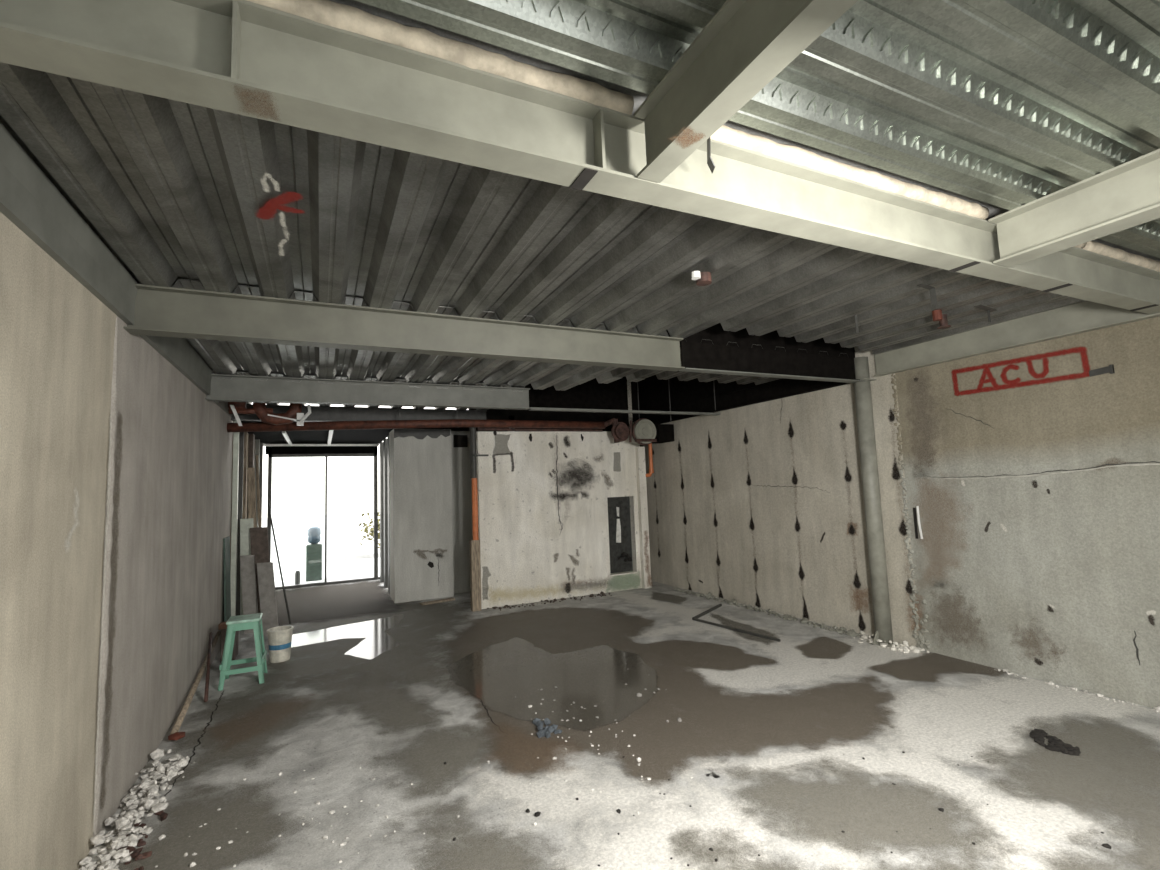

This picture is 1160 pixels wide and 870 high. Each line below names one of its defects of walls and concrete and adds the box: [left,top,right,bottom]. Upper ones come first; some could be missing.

crack [937,461,1160,479]
crack [1132,631,1140,665]